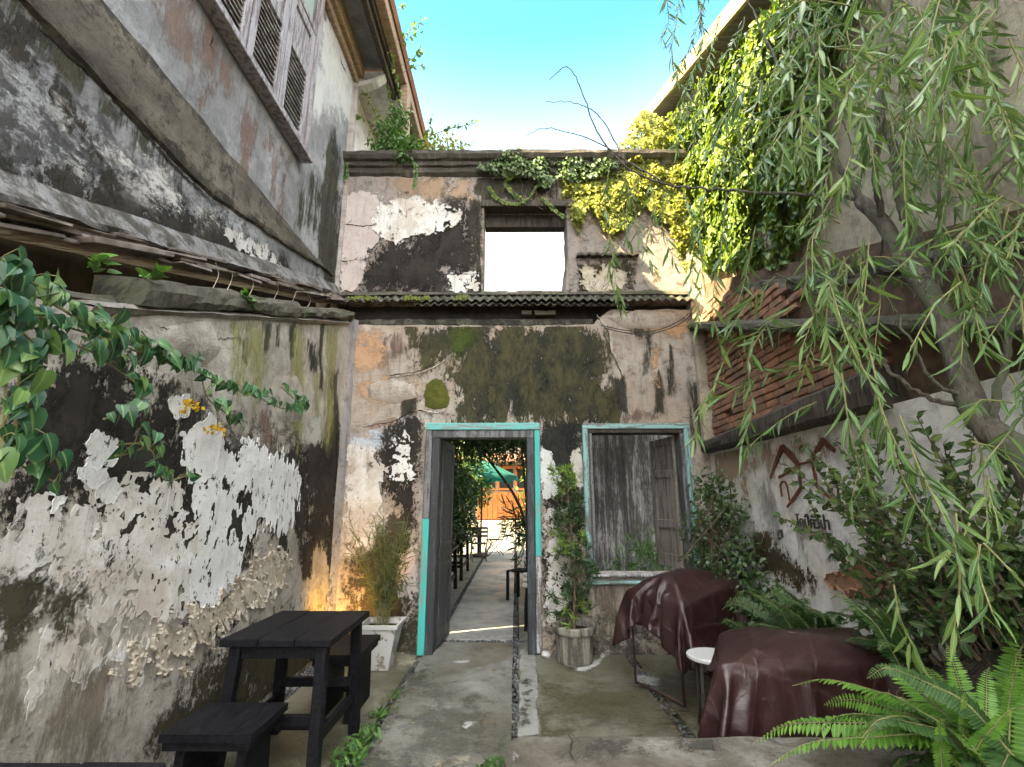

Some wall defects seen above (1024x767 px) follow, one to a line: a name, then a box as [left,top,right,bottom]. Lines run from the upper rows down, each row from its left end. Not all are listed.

damp [0,0,292,269]
spalling [0,238,316,307]
peeling [224,227,282,266]
peeling [339,190,463,293]
damp [355,178,566,298]
peeling [447,271,481,293]
spalling [578,263,631,297]
damp [630,311,701,448]
peeling [0,394,302,721]
damp [0,321,629,701]
peeling [342,417,416,556]
damp [715,437,830,597]